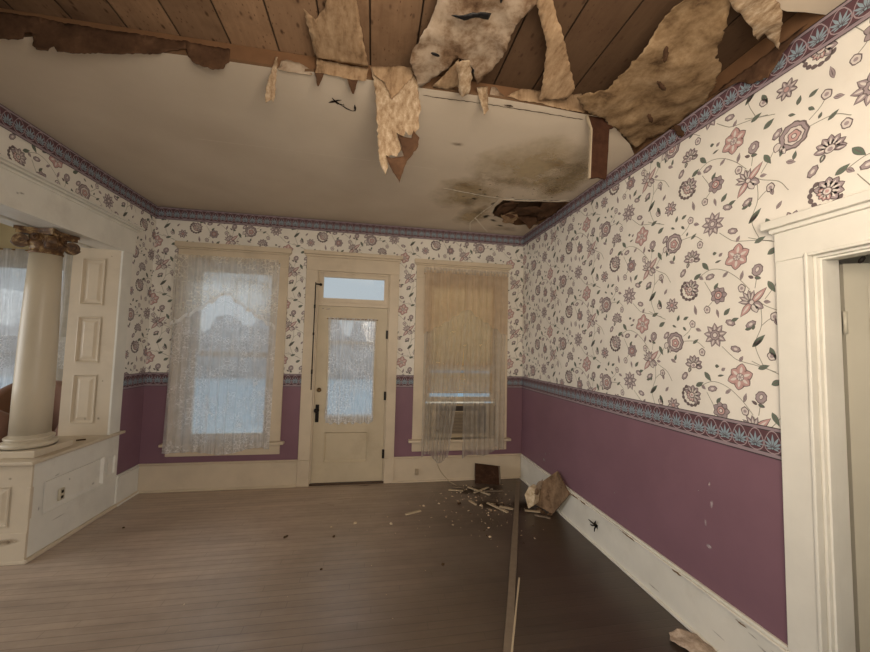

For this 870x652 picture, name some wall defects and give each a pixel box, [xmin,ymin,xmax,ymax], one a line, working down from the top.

peeling [278,60,313,75]
peeling [490,198,570,229]